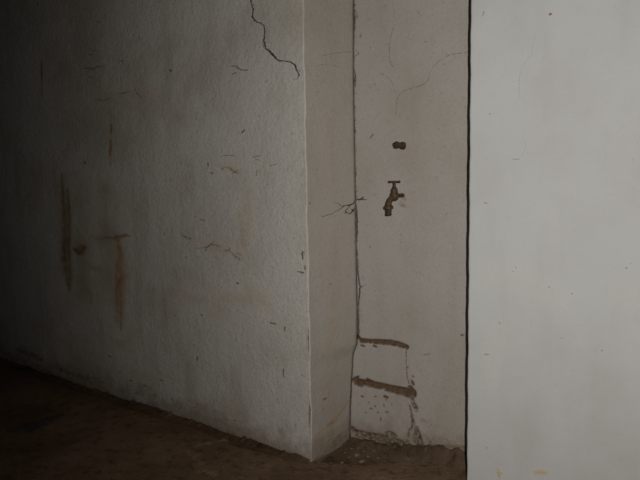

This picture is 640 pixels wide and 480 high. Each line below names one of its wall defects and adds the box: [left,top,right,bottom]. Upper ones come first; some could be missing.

crack [250,0,300,79]
crack [322,4,361,86]
crack [321,172,367,337]
flaking render [358,336,409,350]
flaking render [350,376,422,446]